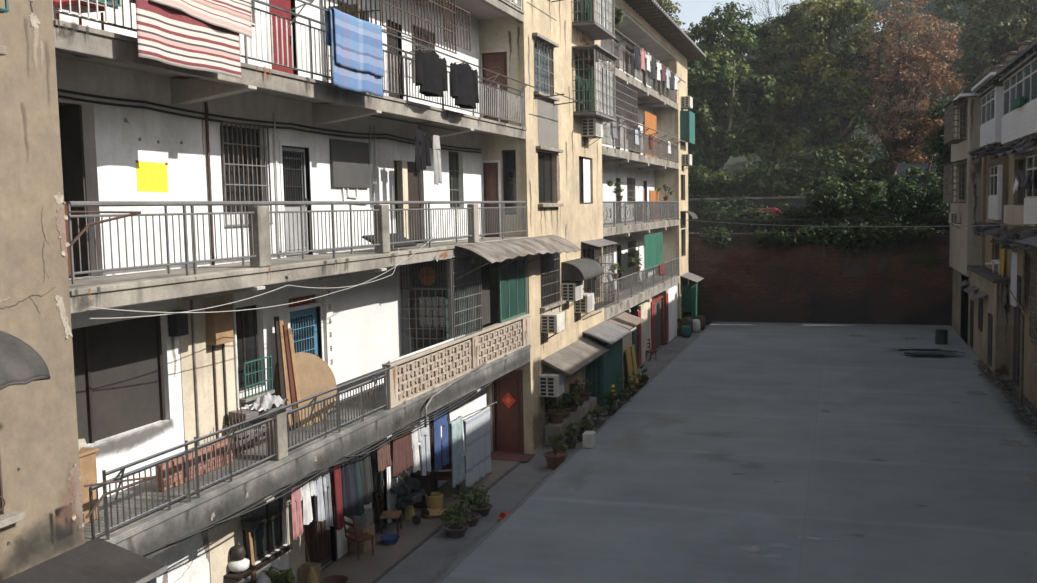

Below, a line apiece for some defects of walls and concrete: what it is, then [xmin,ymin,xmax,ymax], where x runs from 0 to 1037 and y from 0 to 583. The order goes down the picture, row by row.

flaking render [29,0,40,29]
crack [0,208,56,312]